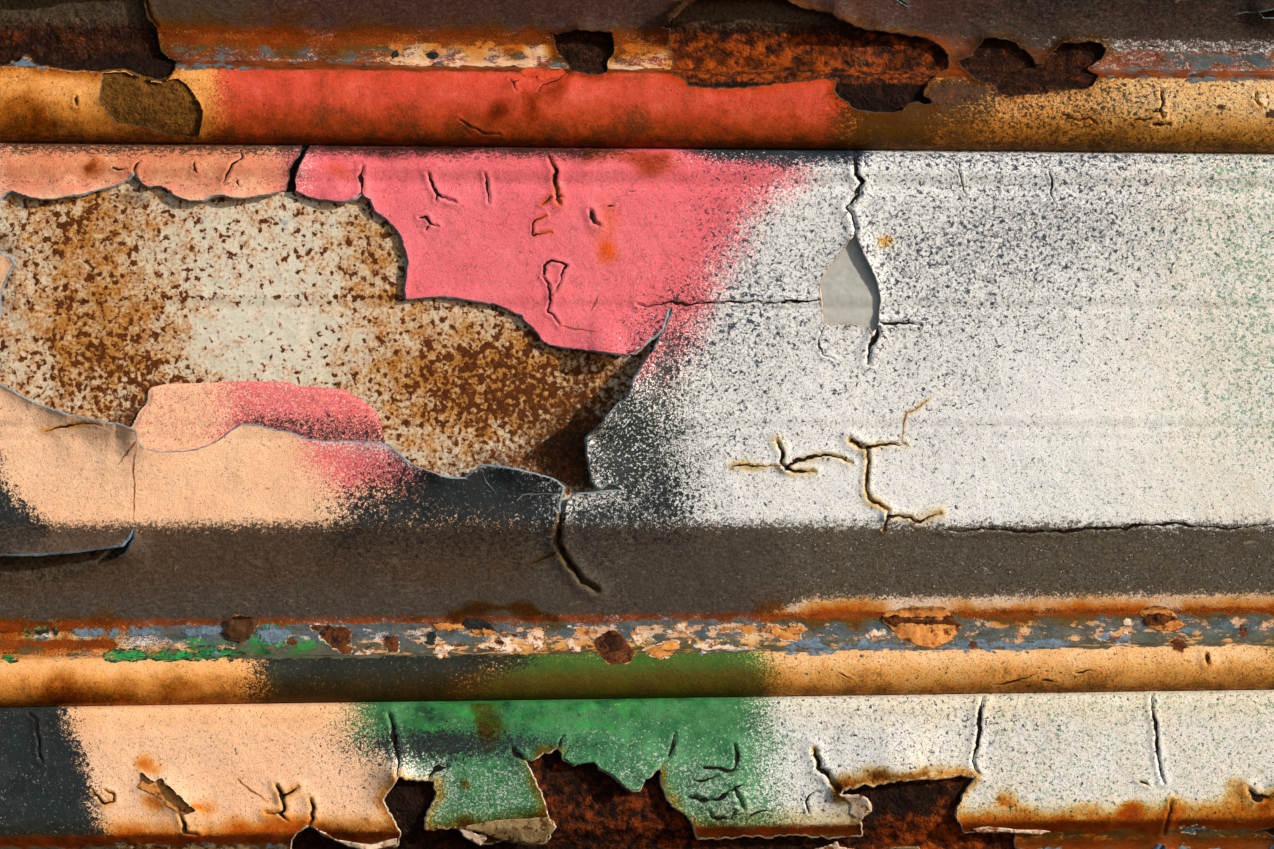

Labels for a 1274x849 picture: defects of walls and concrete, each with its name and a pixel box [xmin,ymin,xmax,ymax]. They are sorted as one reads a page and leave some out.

spalling [0,0,265,137]
spalling [656,0,1116,114]
crack [532,157,598,332]
crack [846,153,865,235]
peeling [0,146,673,514]
crack [735,399,1271,534]
corrosion [309,623,354,655]
corrosion [594,629,637,665]
corrosion [815,607,961,627]
corrosion [1168,637,1190,653]
crack [972,670,1091,773]
spalling [115,740,1061,849]